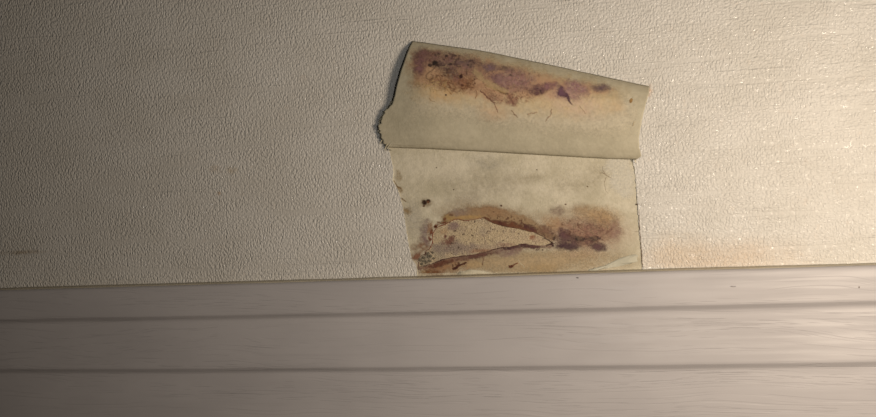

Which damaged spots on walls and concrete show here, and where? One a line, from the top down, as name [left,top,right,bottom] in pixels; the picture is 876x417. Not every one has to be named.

leakage [410,50,636,132]
peeling [388,148,642,278]
leakage [412,204,621,273]